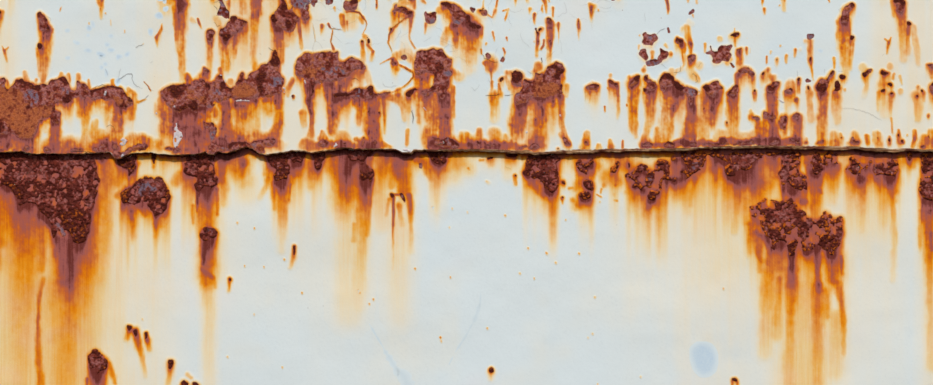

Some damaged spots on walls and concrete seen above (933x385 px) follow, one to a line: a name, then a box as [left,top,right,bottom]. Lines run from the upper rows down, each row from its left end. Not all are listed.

rust [0,0,296,385]
rust [156,0,574,152]
rust [114,148,933,385]
rust [575,1,600,41]
rust [577,128,617,150]
rust [583,0,909,149]
rust [884,0,933,124]
rust [910,127,933,150]